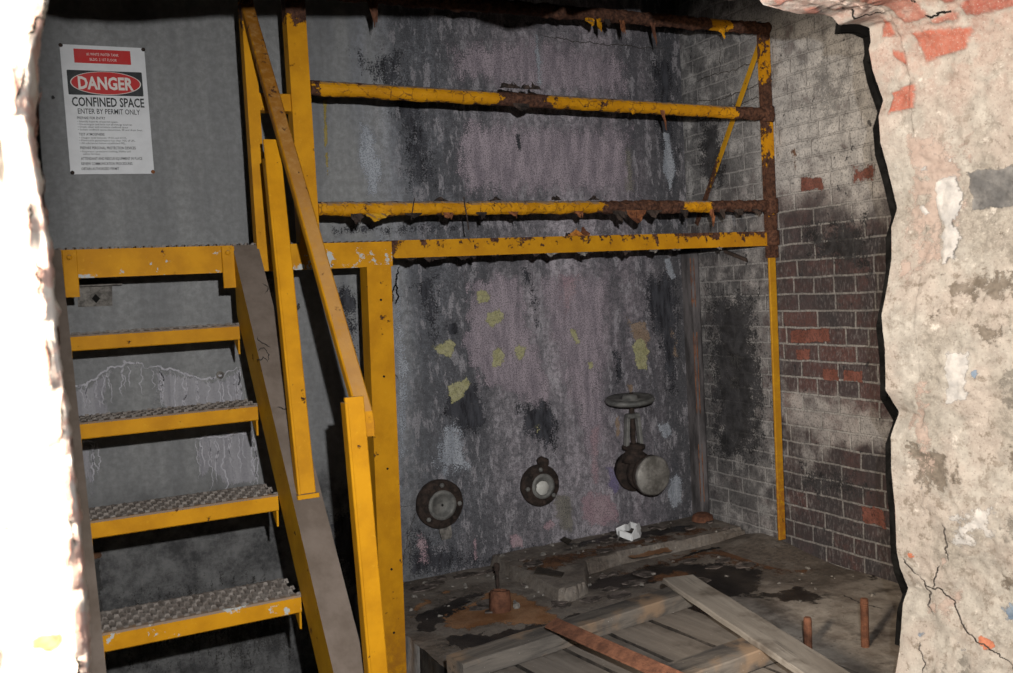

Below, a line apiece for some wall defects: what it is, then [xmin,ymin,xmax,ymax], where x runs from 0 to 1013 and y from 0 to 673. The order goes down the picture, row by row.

peeling [0,0,40,48]
crack [27,0,48,35]
crack [911,0,951,19]
peeling [0,63,18,116]
peeling [0,203,32,249]
peeling [0,267,46,322]
leakage [75,360,244,416]
leakage [702,277,774,474]
leakage [195,429,259,489]
corrosion [442,588,557,630]
leakage [589,562,822,604]
crack [904,525,1013,669]